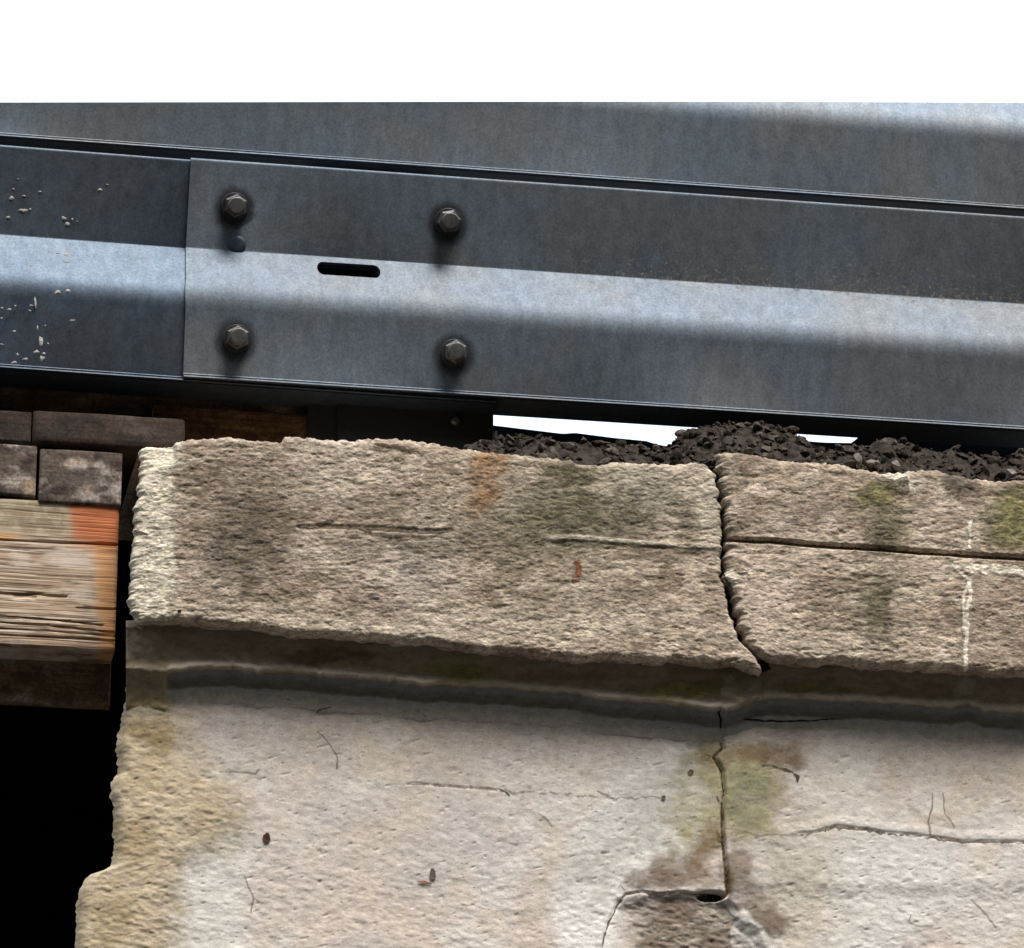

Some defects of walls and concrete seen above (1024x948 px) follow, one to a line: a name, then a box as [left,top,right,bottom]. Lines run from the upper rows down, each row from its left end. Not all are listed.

water stain [876,471,924,491]
water stain [874,508,901,549]
crack [710,456,1024,672]
efflorescence [952,562,1024,702]
water stain [679,745,802,850]
crack [601,708,844,948]
crack [800,825,1024,844]
water stain [725,851,750,884]
water stain [723,898,784,948]